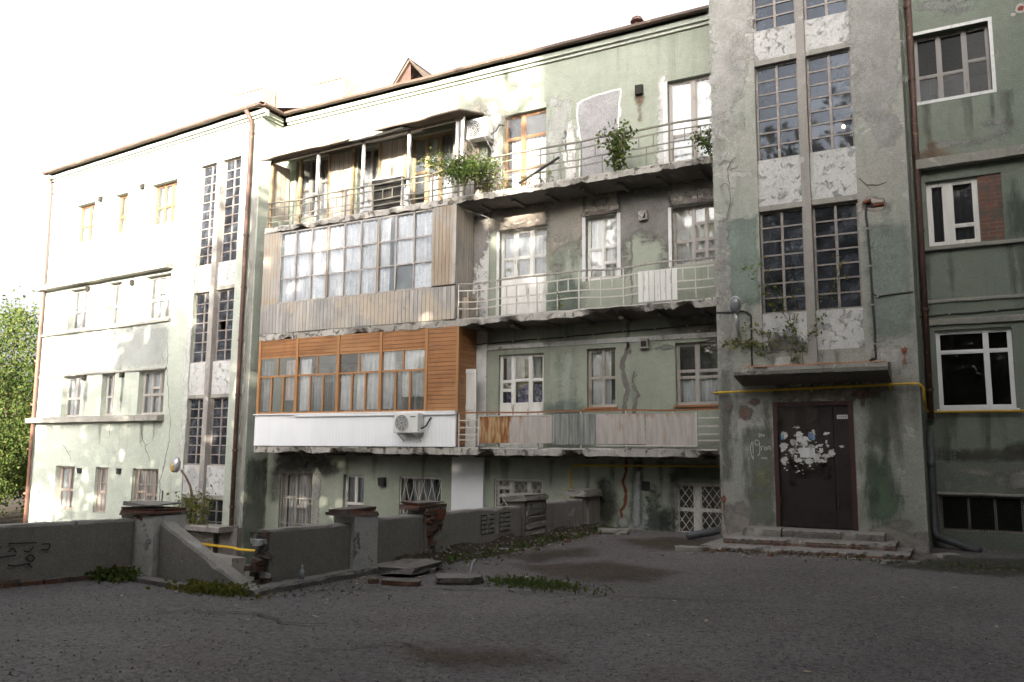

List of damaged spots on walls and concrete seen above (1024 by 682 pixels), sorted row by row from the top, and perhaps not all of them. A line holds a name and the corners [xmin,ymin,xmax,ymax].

peeling [547,97,581,182]
peeling [585,0,757,275]
peeling [473,203,551,300]
crack [619,233,641,414]
crack [140,326,171,501]